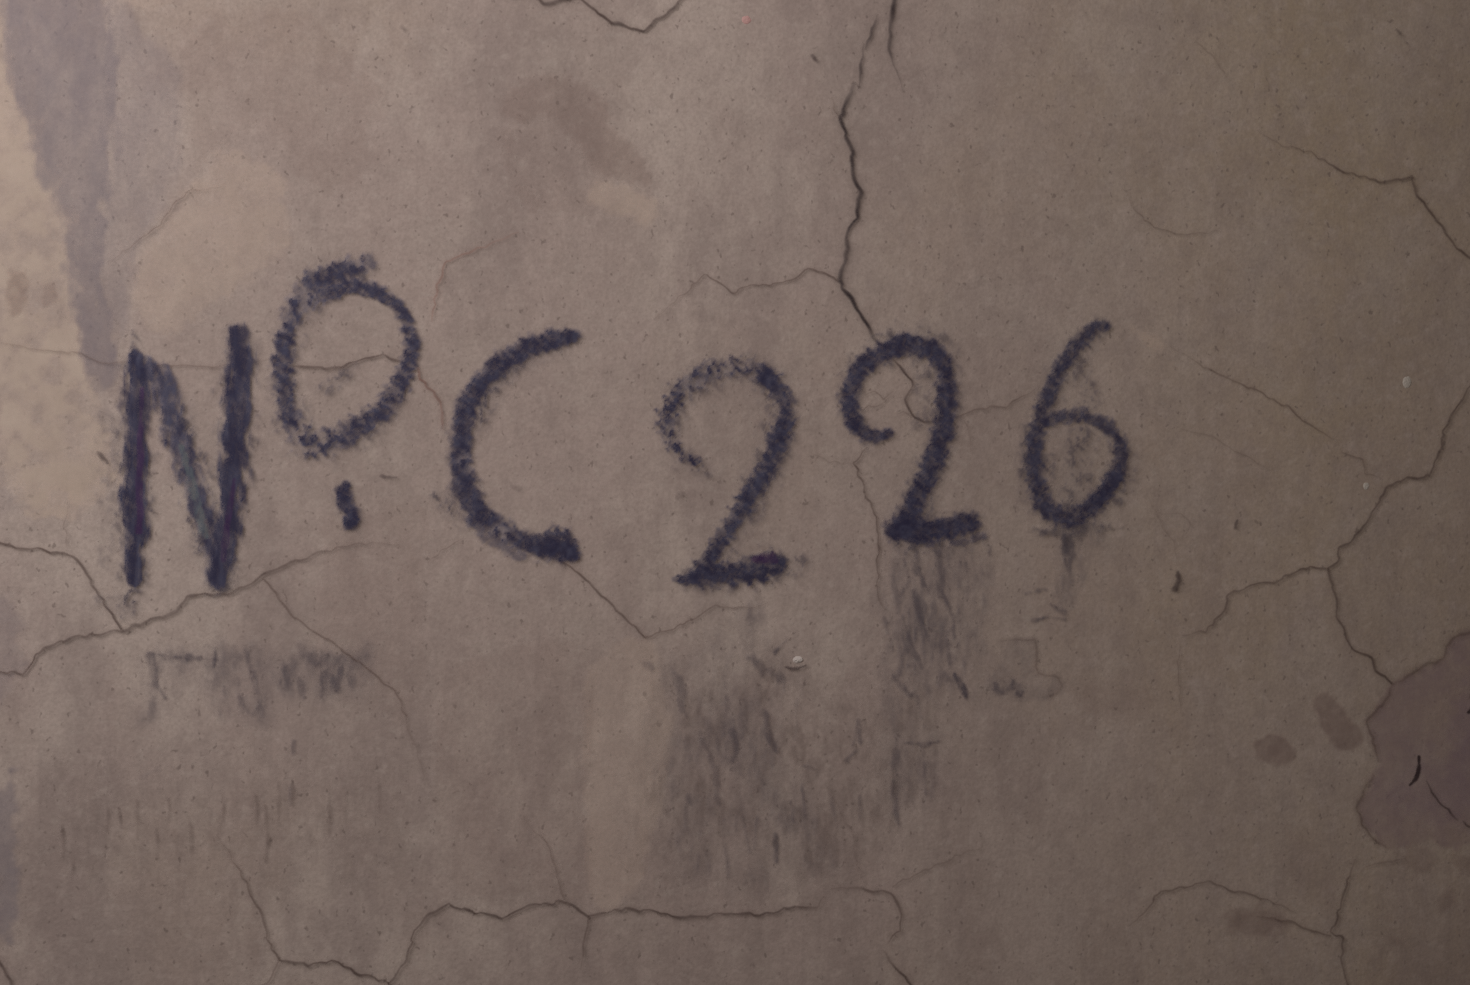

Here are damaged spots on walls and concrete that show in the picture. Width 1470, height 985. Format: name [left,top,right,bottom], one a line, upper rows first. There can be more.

crack [540,0,680,32]
crack [742,0,895,330]
crack [1334,166,1466,255]
crack [298,354,426,386]
crack [898,364,928,422]
crack [1214,400,1462,684]
crack [0,542,300,675]
crack [276,900,796,985]